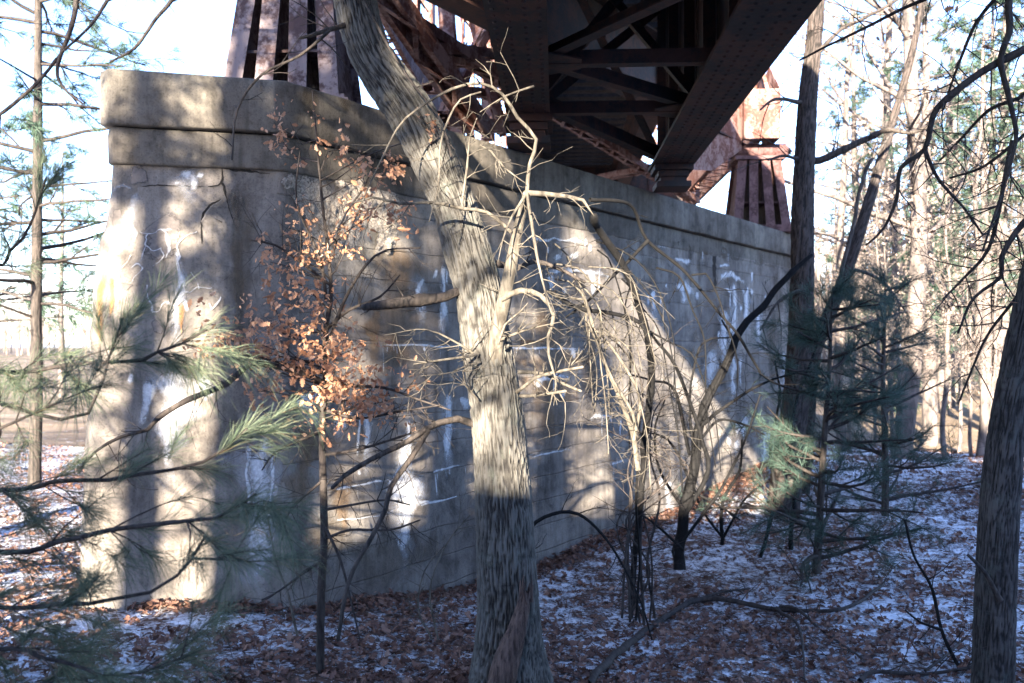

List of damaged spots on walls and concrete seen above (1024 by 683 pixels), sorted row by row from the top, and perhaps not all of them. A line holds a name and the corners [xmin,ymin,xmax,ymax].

crack [122,168,270,313]